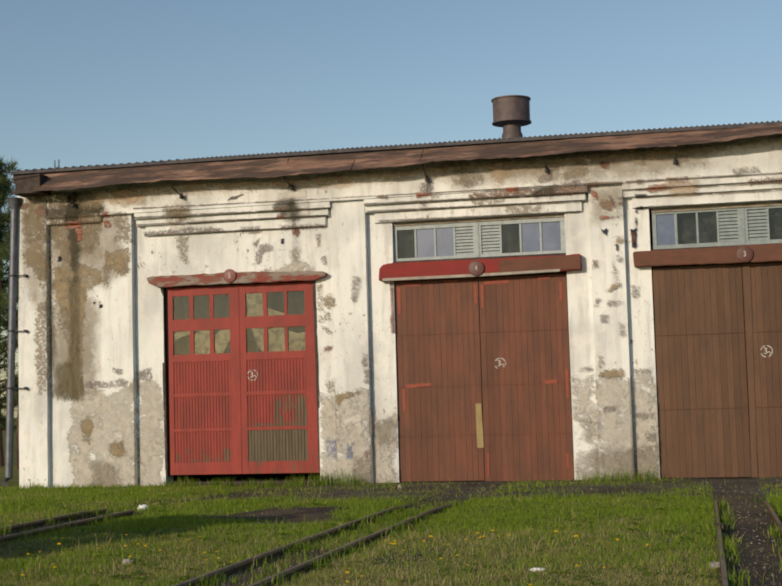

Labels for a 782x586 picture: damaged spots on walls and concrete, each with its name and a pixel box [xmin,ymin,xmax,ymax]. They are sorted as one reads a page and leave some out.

damp [301,175,353,187]
flaking render [748,177,782,185]
flaking render [20,191,134,296]
damp [34,189,328,400]
flaking render [317,284,335,333]
flaking render [67,368,166,487]
flaking render [319,356,399,484]
flaking render [570,357,659,480]